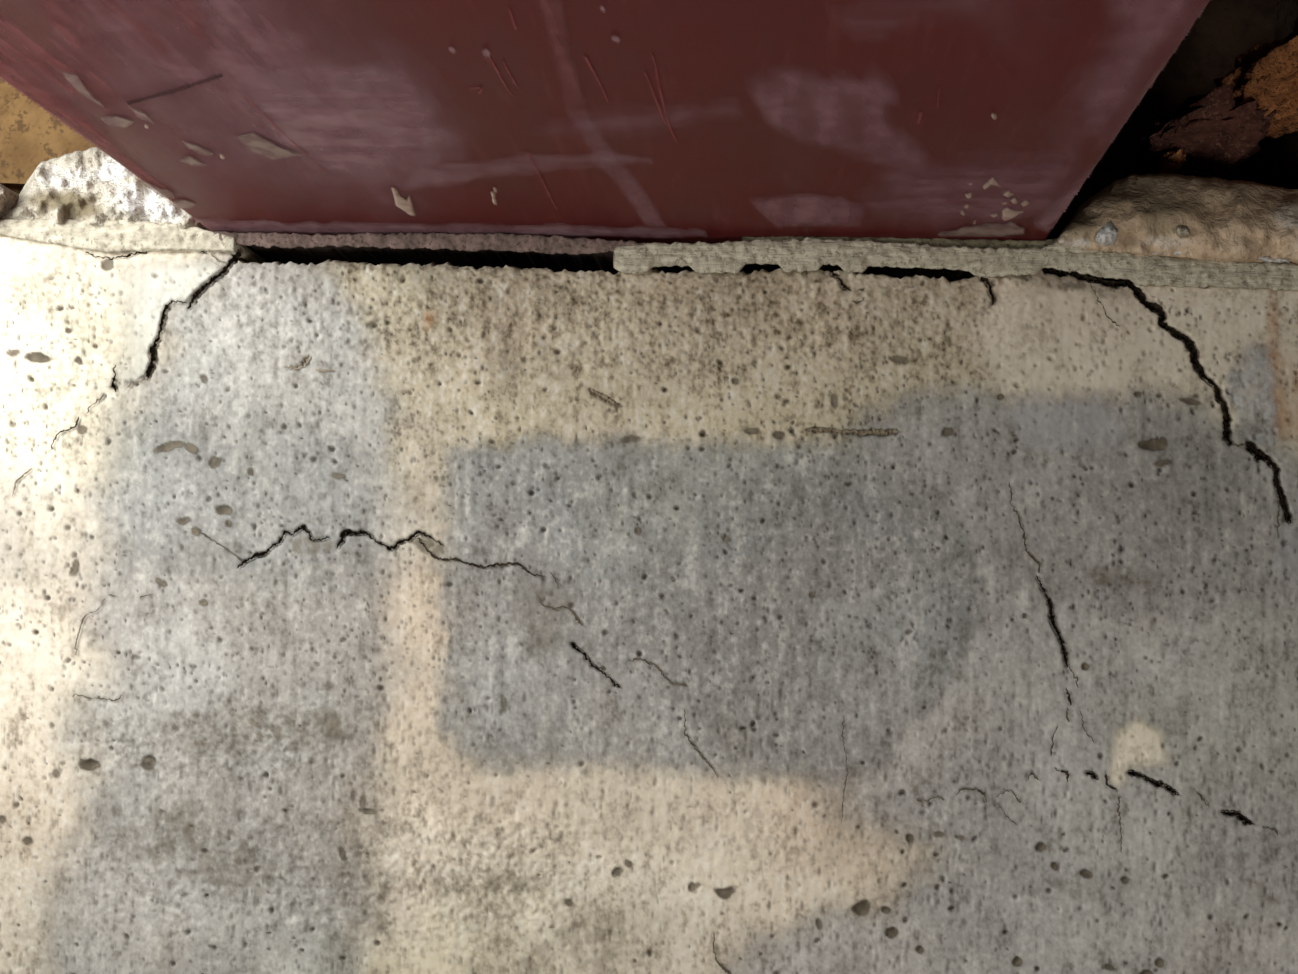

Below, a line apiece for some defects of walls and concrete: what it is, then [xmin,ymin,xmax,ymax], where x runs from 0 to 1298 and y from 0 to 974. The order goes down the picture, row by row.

crack [12,249,241,496]
crack [832,272,865,304]
crack [981,277,995,305]
crack [1045,269,1291,532]
crack [198,525,718,777]
crack [916,482,1278,850]